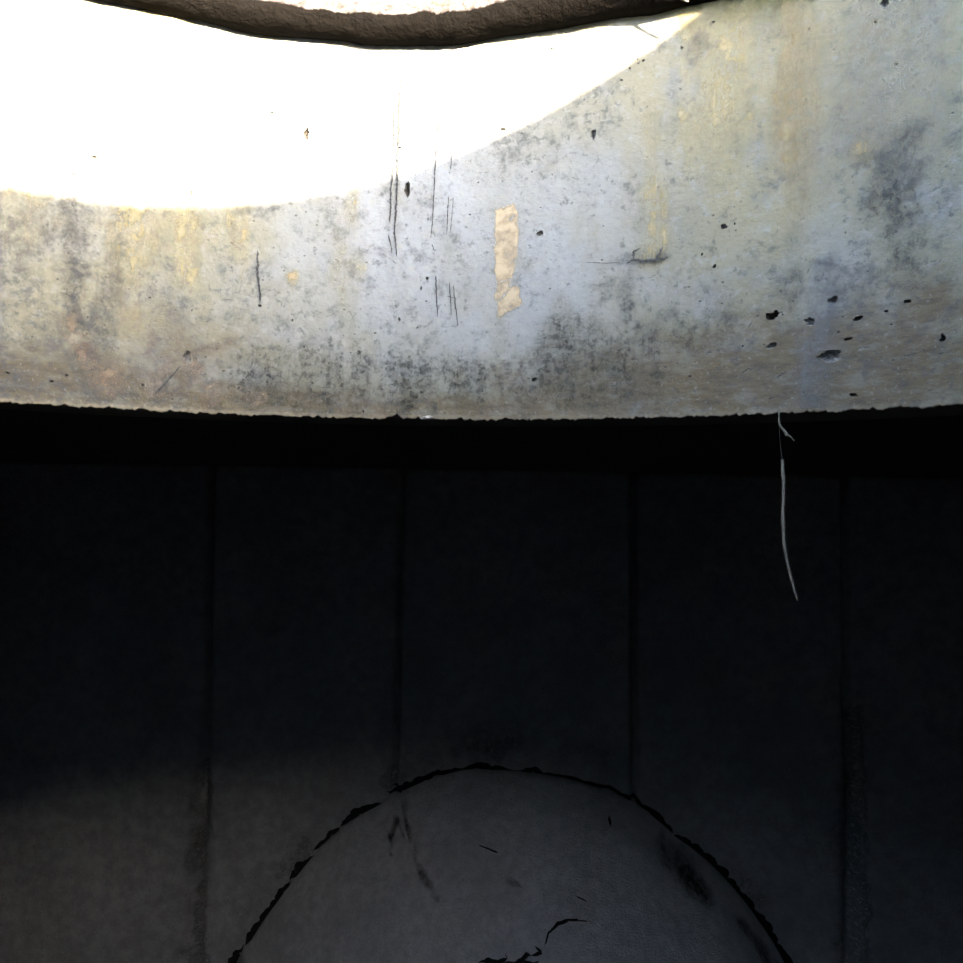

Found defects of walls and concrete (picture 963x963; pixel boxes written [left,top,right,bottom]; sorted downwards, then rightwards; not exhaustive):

peeling [494,203,522,318]
crack [228,762,793,963]